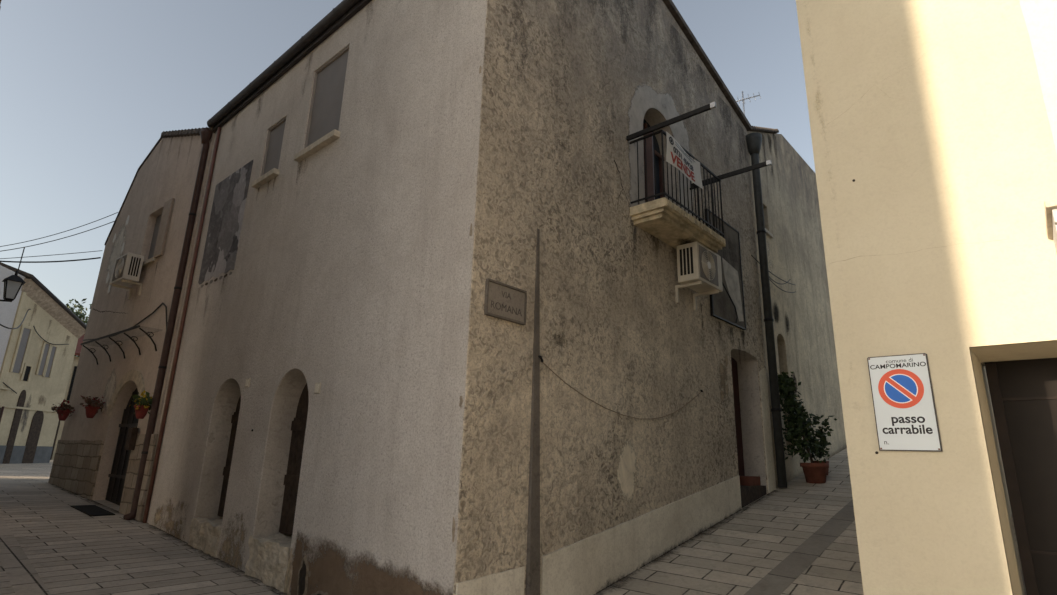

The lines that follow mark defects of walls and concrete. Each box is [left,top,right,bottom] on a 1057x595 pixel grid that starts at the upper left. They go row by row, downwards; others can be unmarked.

water stain [290,532,453,595]